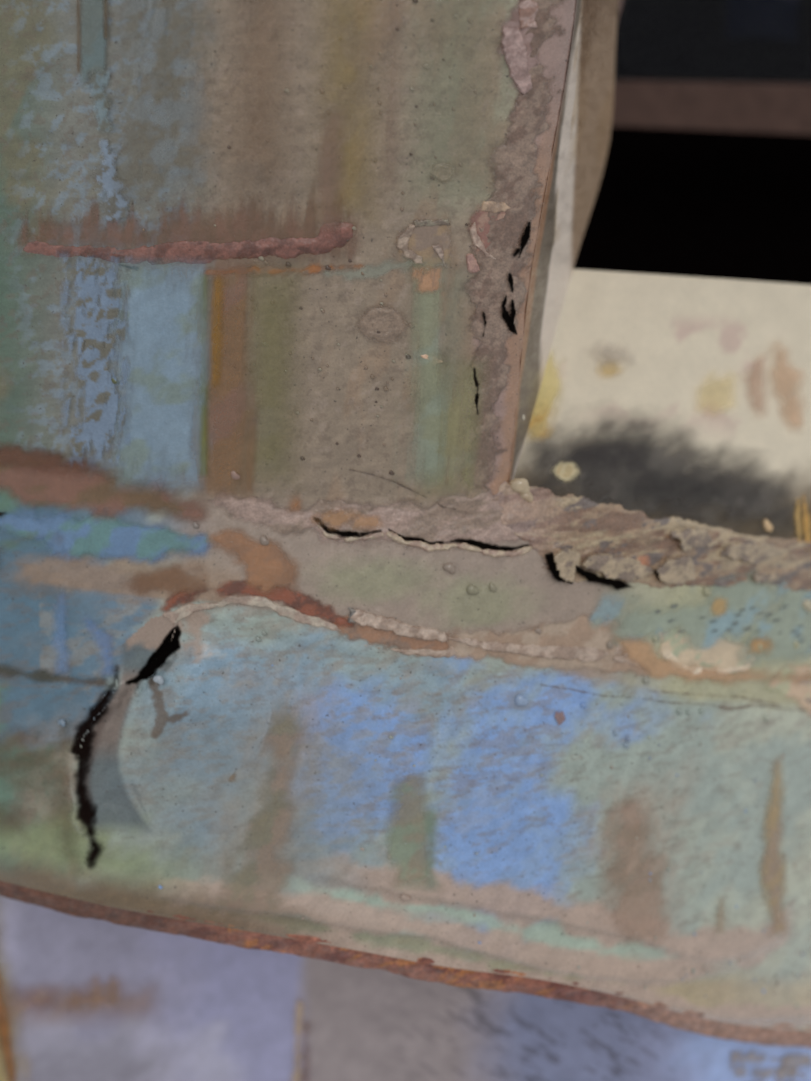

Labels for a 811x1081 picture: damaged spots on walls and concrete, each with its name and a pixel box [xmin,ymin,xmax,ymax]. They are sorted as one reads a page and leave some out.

peeling [499,0,539,95]
leakage [77,0,128,221]
leakage [66,262,200,480]
rust [0,448,204,519]
rust [134,569,199,591]
rust [212,531,296,592]
peeling [554,527,718,585]
rust [762,764,784,929]